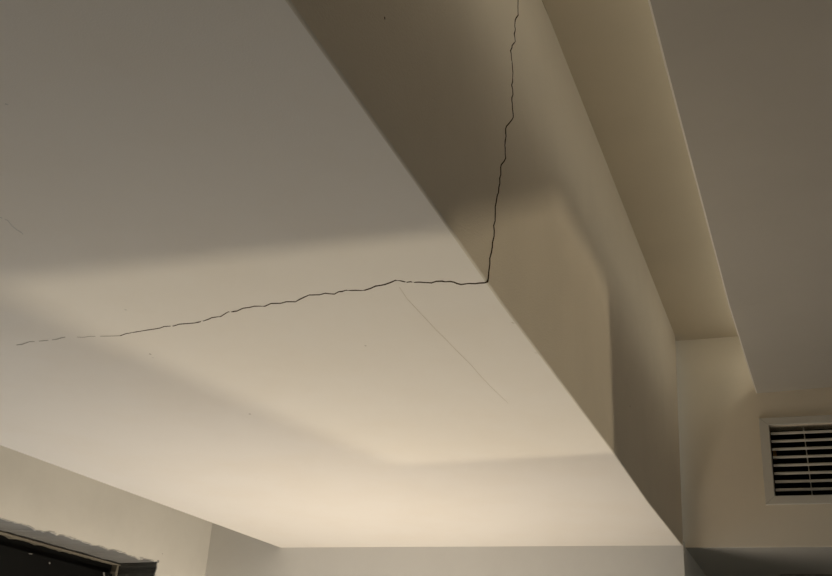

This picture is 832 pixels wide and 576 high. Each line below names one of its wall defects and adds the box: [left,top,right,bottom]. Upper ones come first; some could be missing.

crack [18,14,519,403]